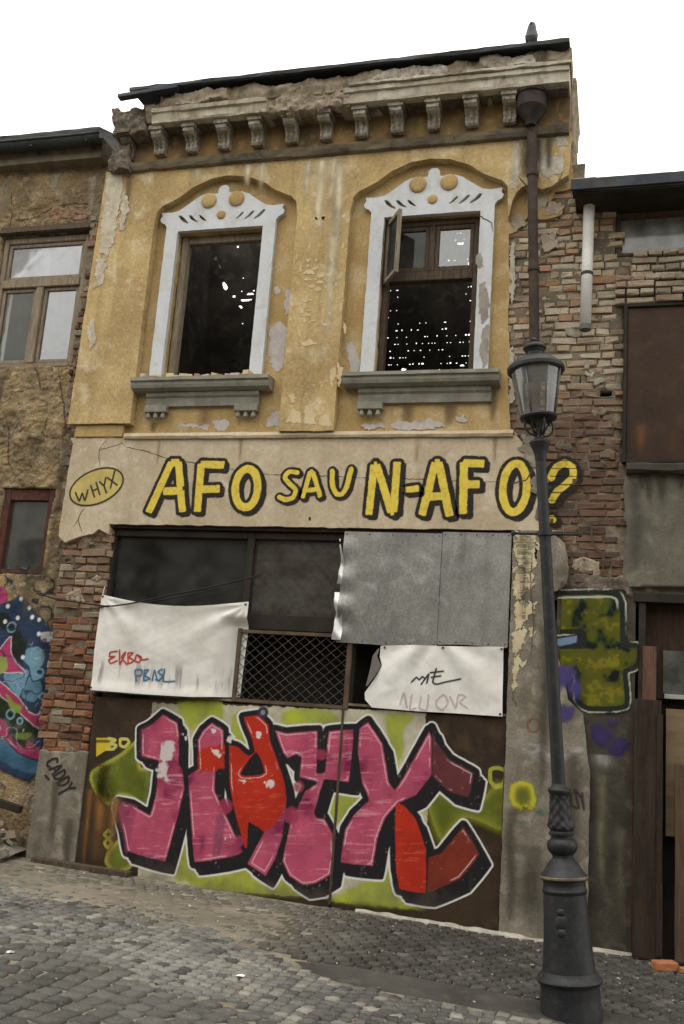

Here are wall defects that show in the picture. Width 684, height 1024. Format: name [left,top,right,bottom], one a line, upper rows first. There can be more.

flaking render [363,64,448,80]
flaking render [479,54,536,68]
flaking render [174,87,229,106]
flaking render [2,174,130,465]
peeling [268,254,344,372]
peeling [330,324,361,388]
peeling [179,419,230,432]
peeling [266,393,332,427]
flaking render [360,414,468,431]
crack [98,442,195,464]
flaking render [566,557,653,597]
peeling [510,530,540,705]